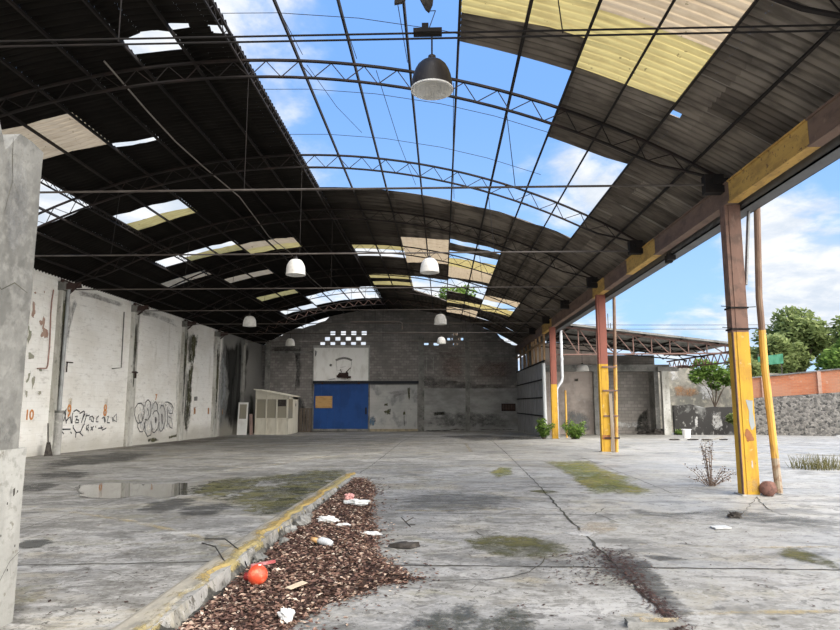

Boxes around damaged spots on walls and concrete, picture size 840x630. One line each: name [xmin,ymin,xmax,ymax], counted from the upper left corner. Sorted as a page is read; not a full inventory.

damp [182,331,197,429]
damp [215,341,254,426]
crack [458,556,545,590]